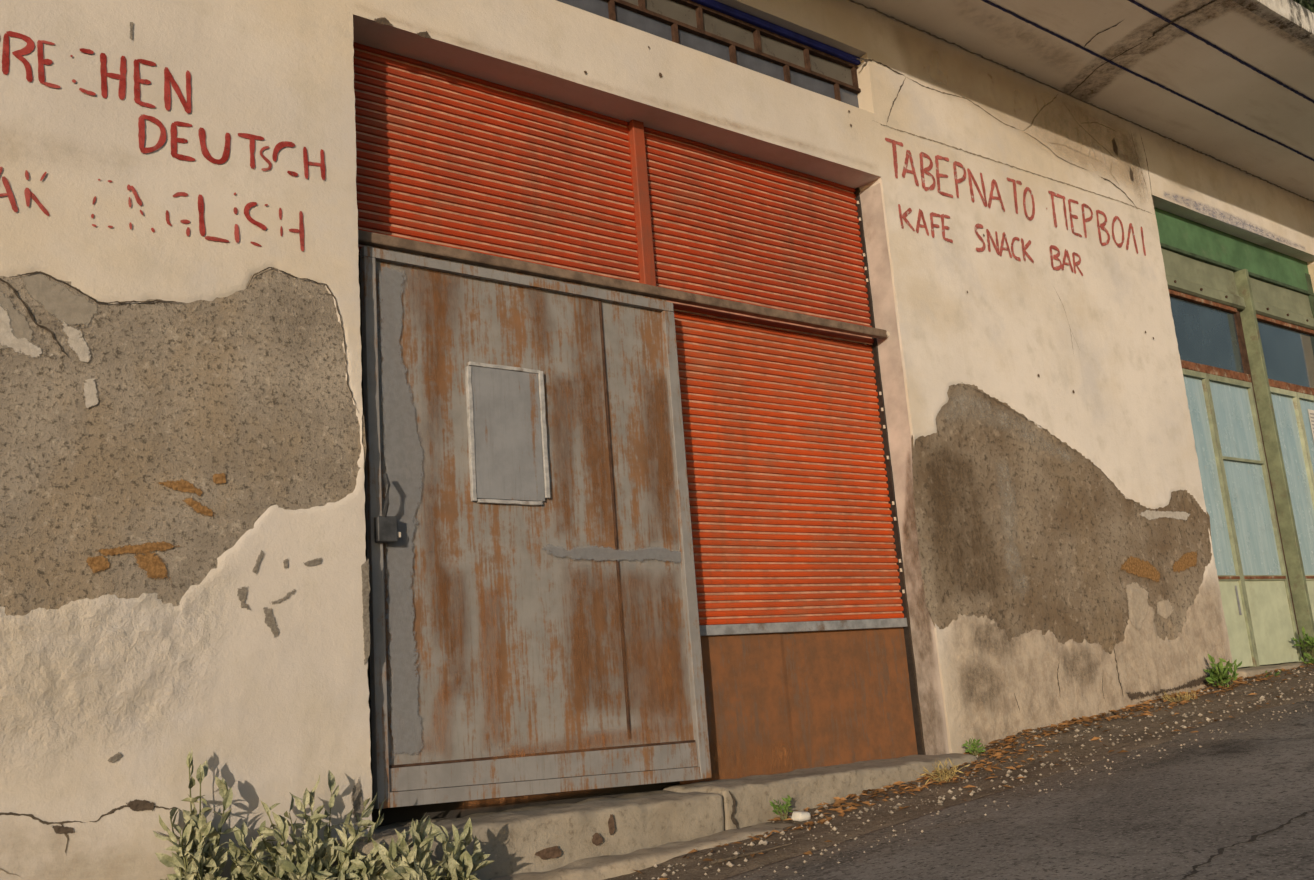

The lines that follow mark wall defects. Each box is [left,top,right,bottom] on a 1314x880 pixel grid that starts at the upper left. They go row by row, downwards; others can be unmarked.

flaking render [0,267,366,616]
spalling [237,587,296,637]
flaking render [911,382,1212,654]
crack [0,805,183,852]